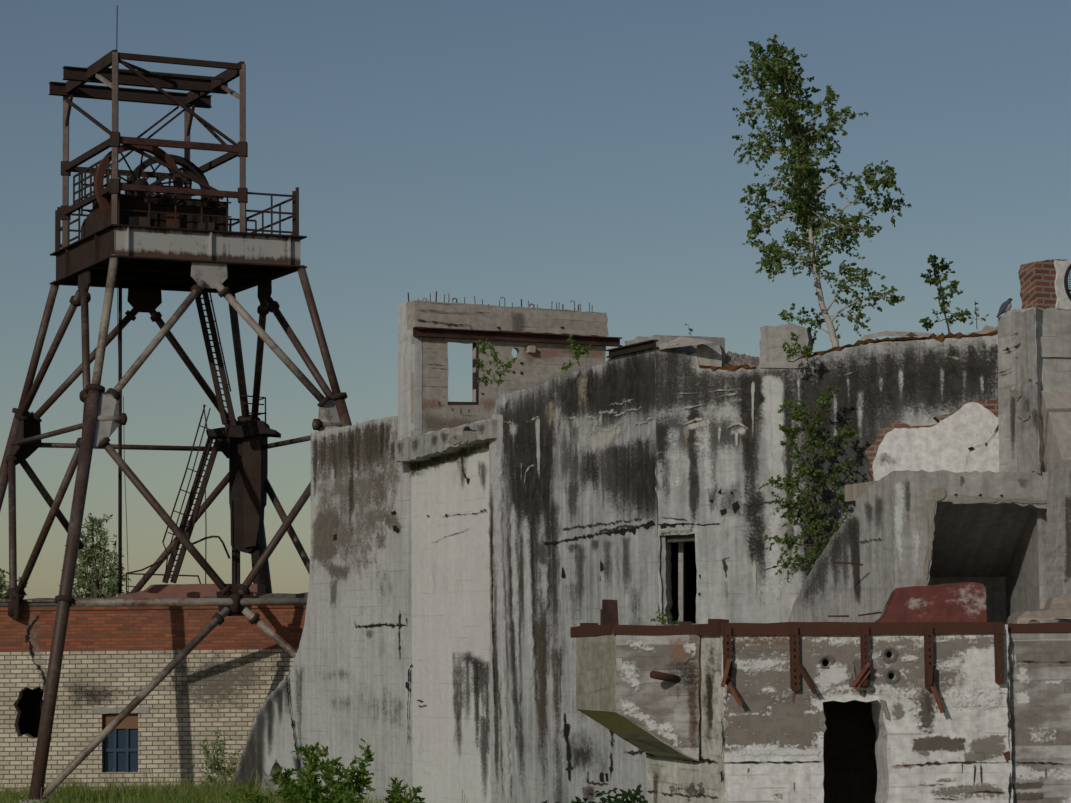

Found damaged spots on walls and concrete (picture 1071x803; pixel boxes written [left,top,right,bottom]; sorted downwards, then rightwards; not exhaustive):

water stain [312,423,421,604]
crack [544,500,775,552]
water stain [453,344,998,803]
crack [25,615,46,710]
crack [354,612,426,744]